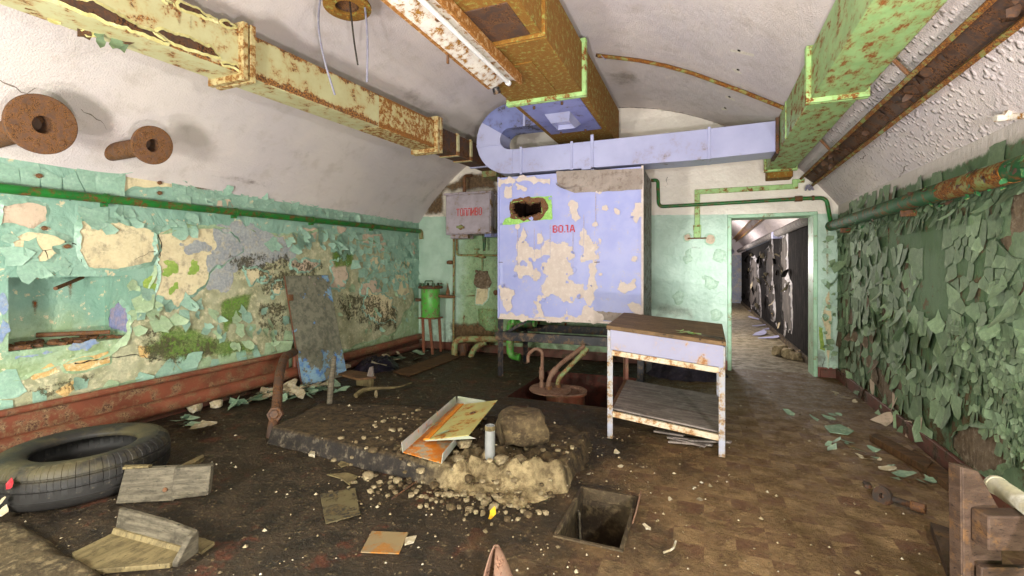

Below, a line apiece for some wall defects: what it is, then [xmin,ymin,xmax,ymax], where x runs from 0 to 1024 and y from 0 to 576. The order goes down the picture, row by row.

rust [44,0,239,73]
rust [933,160,1023,200]
flaking render [0,163,421,410]
flaking render [741,233,793,337]
flaking render [821,140,1024,476]